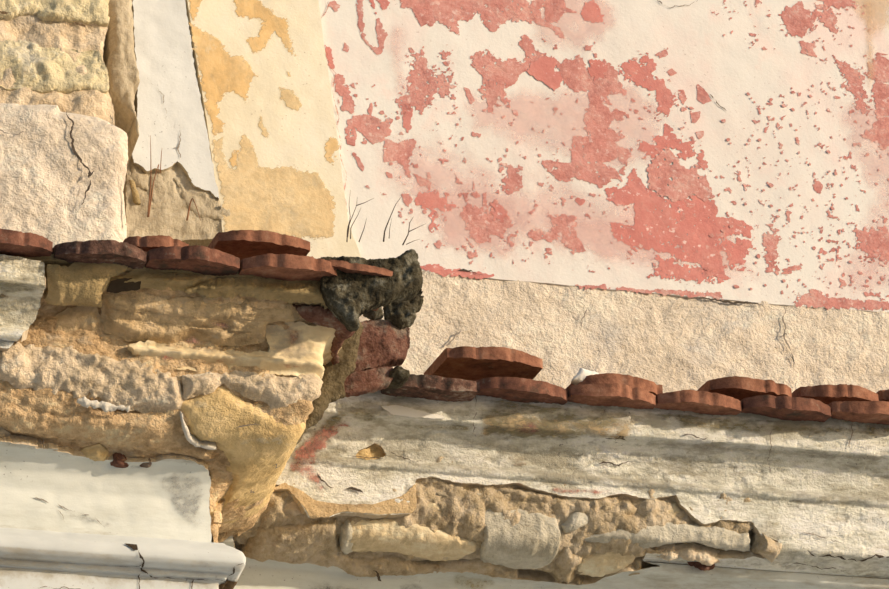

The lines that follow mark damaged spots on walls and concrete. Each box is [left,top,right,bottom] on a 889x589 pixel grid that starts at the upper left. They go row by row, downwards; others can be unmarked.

crack [66,112,94,204]
peeling [123,0,336,247]
peeling [324,0,889,311]
crack [699,297,762,305]
crack [779,310,795,367]
spalling [0,262,782,585]
crack [124,553,244,589]
spalling [219,579,239,589]